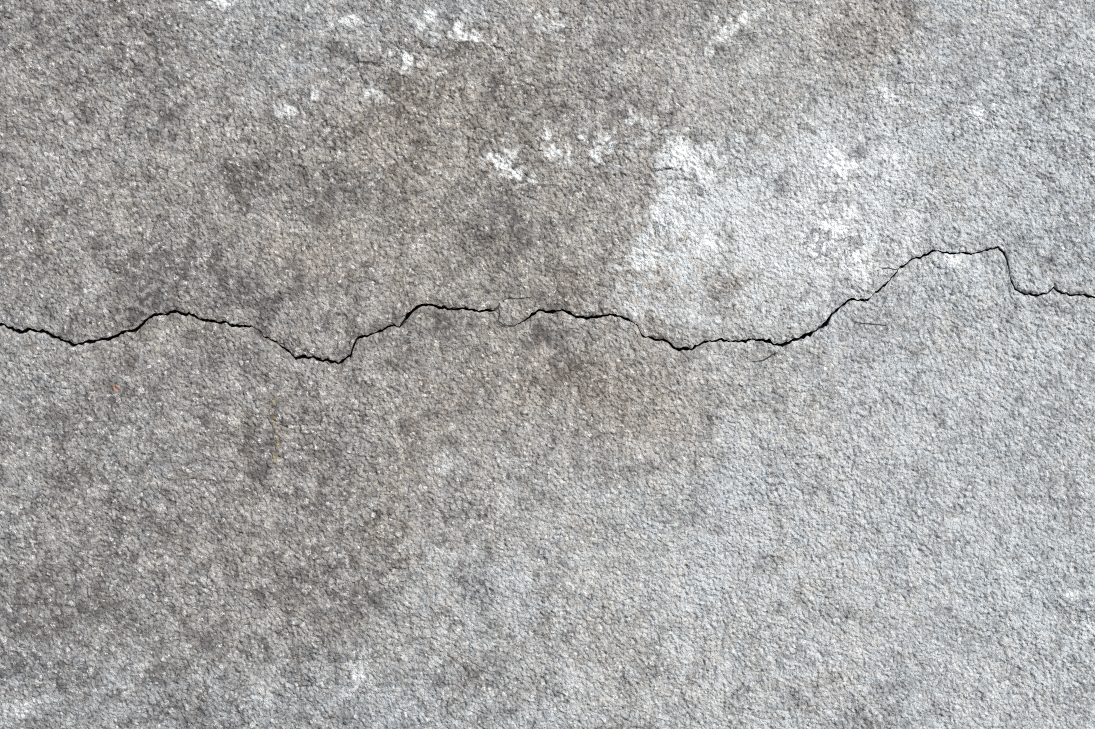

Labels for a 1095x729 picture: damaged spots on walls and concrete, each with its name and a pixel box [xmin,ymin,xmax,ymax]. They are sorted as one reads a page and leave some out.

crack [0,246,1095,364]